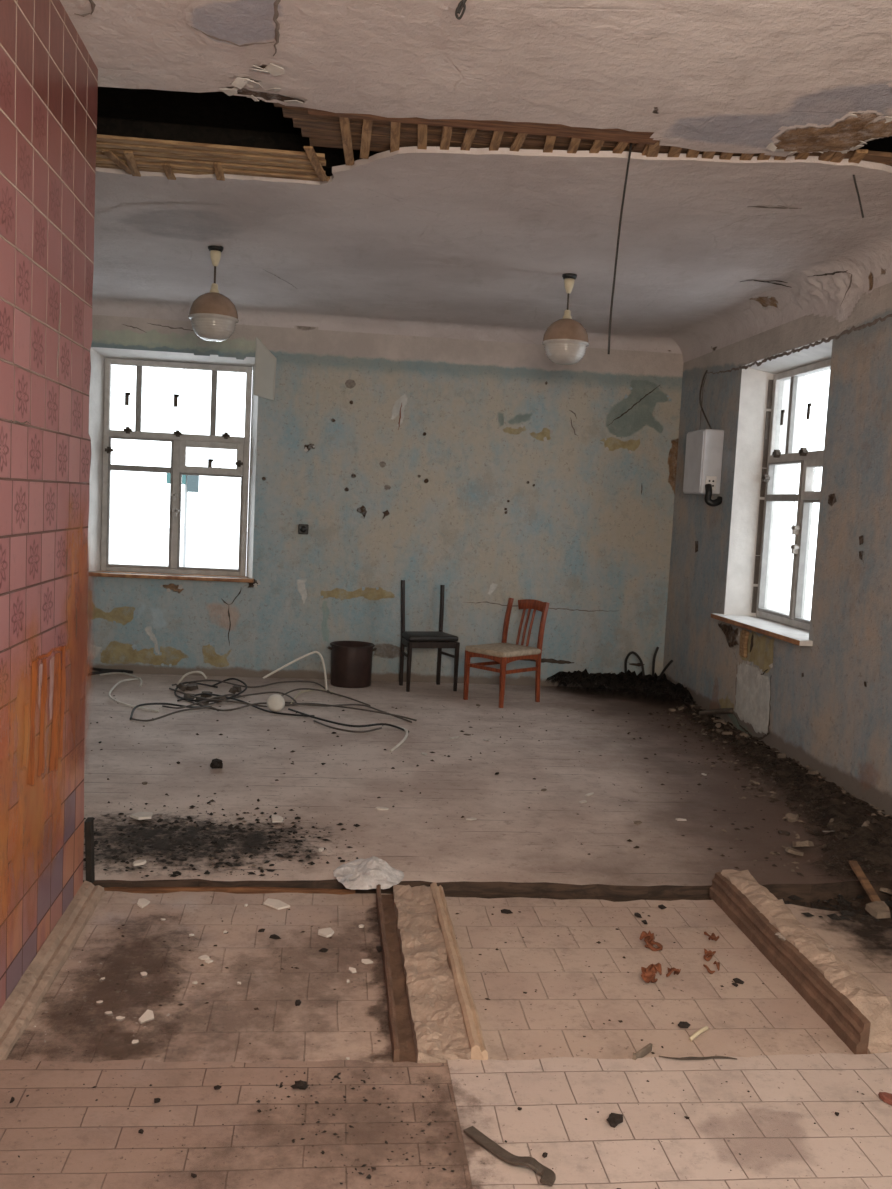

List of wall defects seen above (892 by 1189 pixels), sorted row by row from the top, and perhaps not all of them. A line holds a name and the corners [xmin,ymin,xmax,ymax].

peeling [182,0,290,49]
crack [190,0,304,105]
peeling [766,110,892,154]
peeling [596,376,679,497]
peeling [87,585,233,670]
peeling [318,585,397,604]
rust [22,645,69,785]